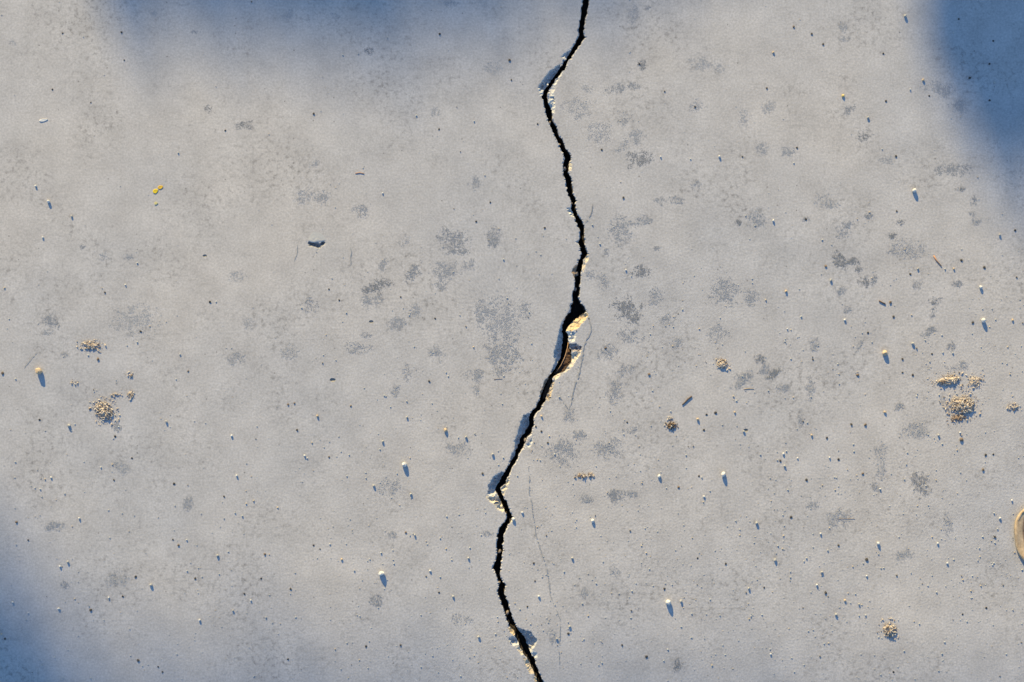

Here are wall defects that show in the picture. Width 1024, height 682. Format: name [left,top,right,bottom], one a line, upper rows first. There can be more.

crack [493,0,593,682]